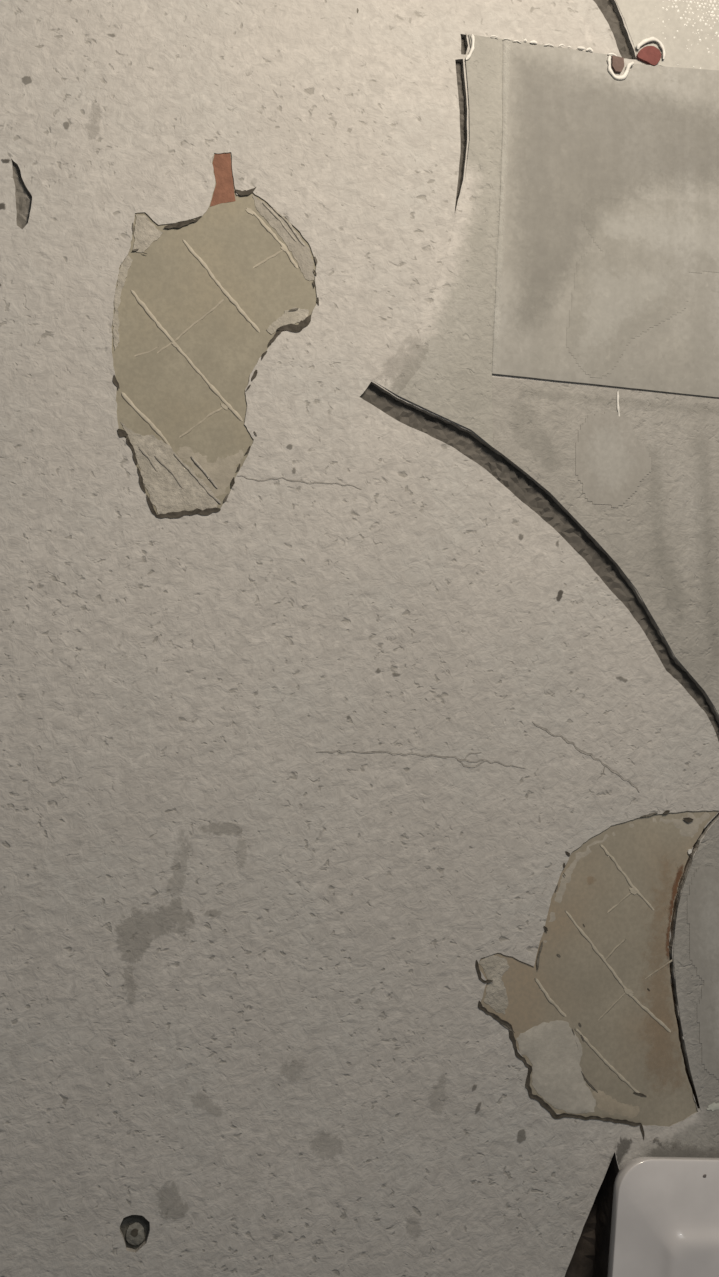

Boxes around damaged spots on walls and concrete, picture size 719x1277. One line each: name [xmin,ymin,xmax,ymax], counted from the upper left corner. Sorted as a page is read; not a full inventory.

spalling [112,153,319,518]